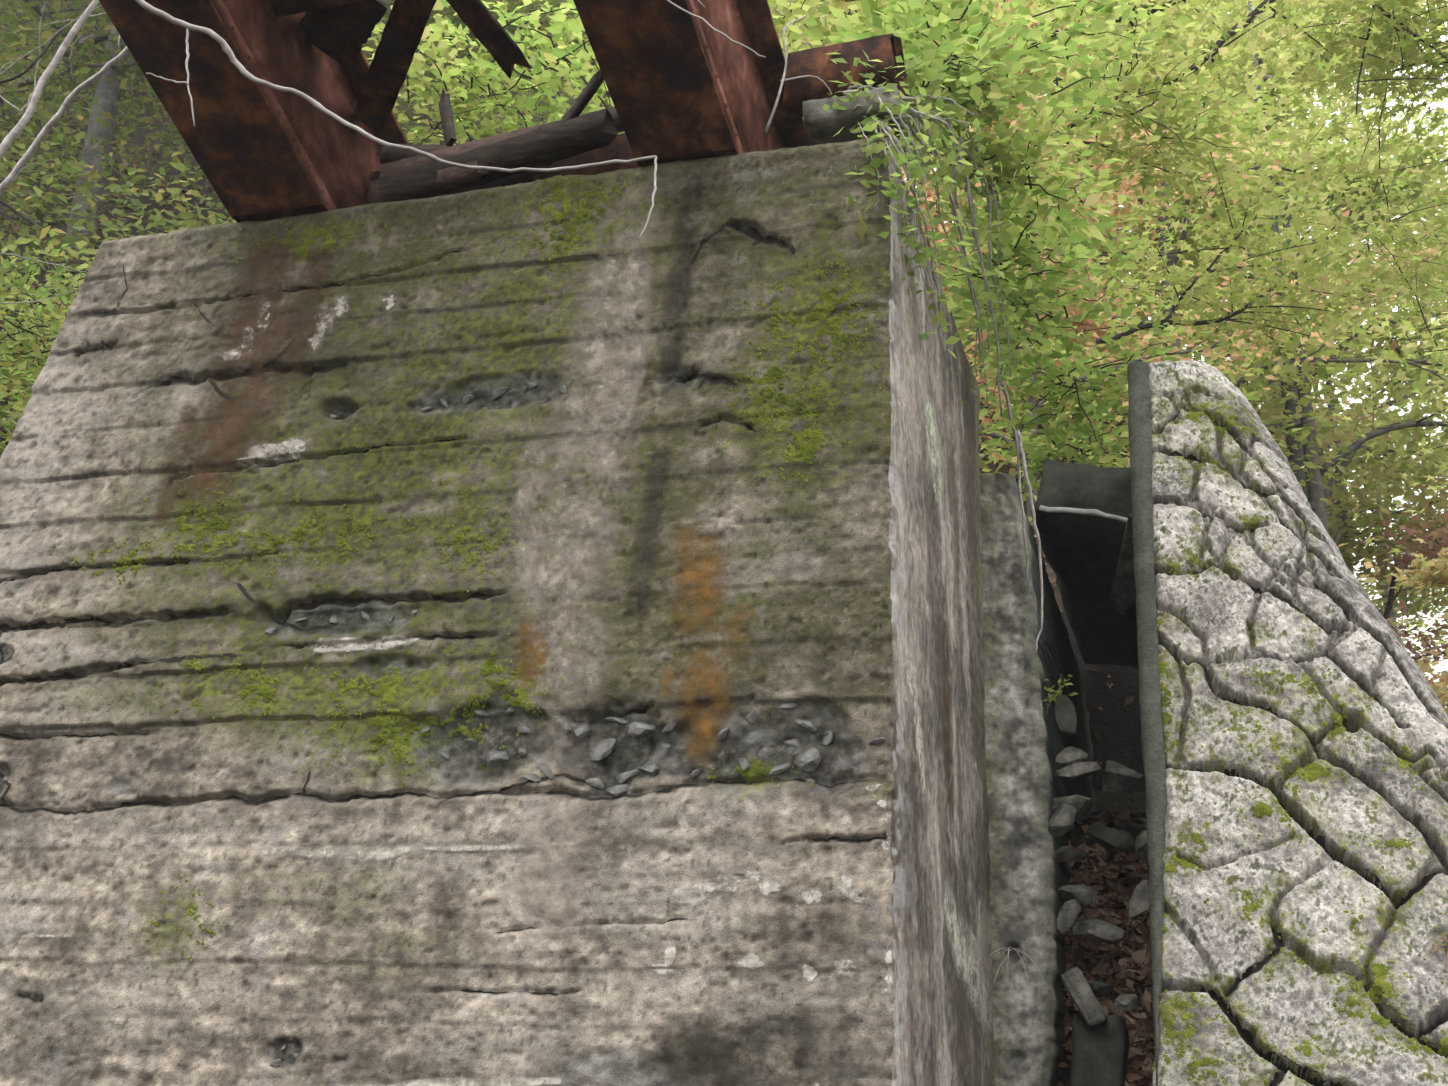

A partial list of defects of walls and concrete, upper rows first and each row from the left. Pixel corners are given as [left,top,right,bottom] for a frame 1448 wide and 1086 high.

crack [0,560,190,584]
crack [0,583,508,684]
crack [571,699,738,723]
crack [0,732,156,740]
spalling [419,703,854,796]
crack [0,771,876,815]
water stain [661,1012,813,1086]